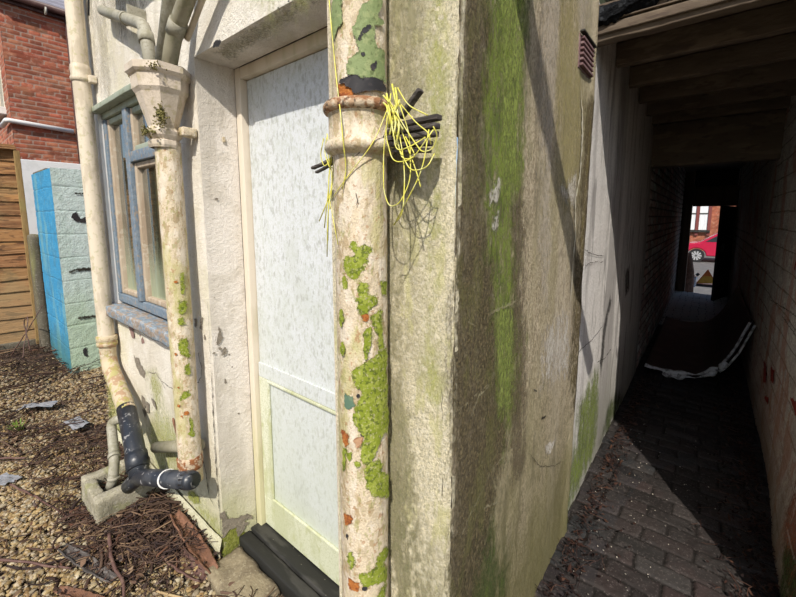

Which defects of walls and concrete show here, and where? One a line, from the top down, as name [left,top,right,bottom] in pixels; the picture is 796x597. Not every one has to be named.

peeling [331,0,344,41]
peeling [339,0,387,94]
damp [445,0,527,597]
flaking render [141,395,156,417]
flaking render [220,511,252,538]